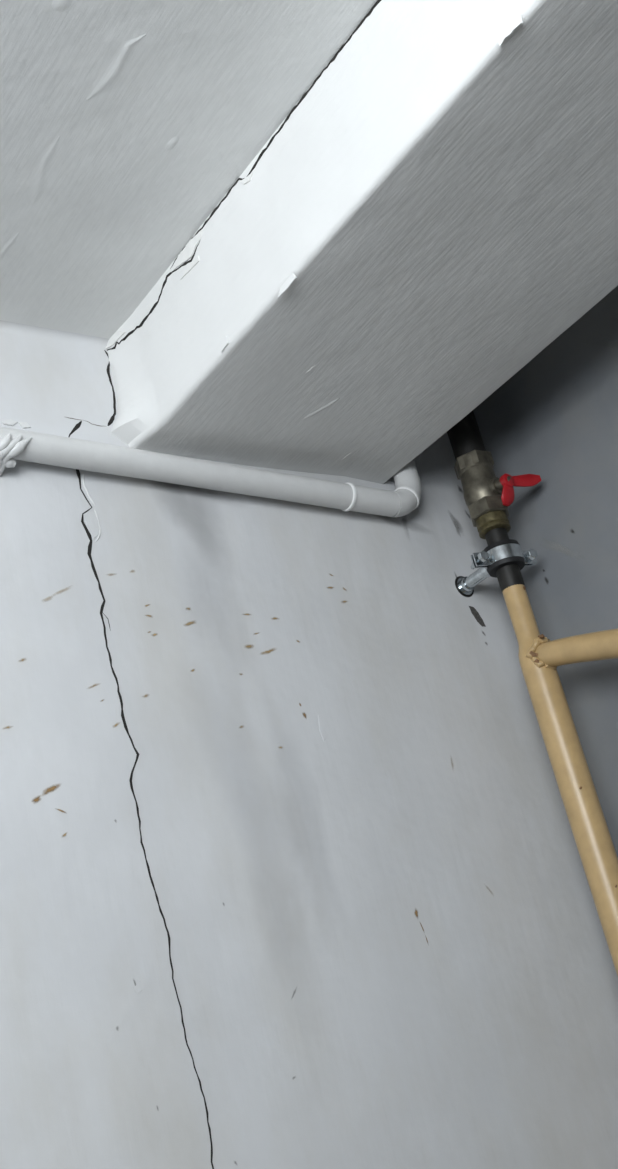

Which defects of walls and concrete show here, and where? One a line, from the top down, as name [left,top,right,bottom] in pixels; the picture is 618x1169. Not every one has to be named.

crack [66,0,381,437]
crack [76,469,214,1169]